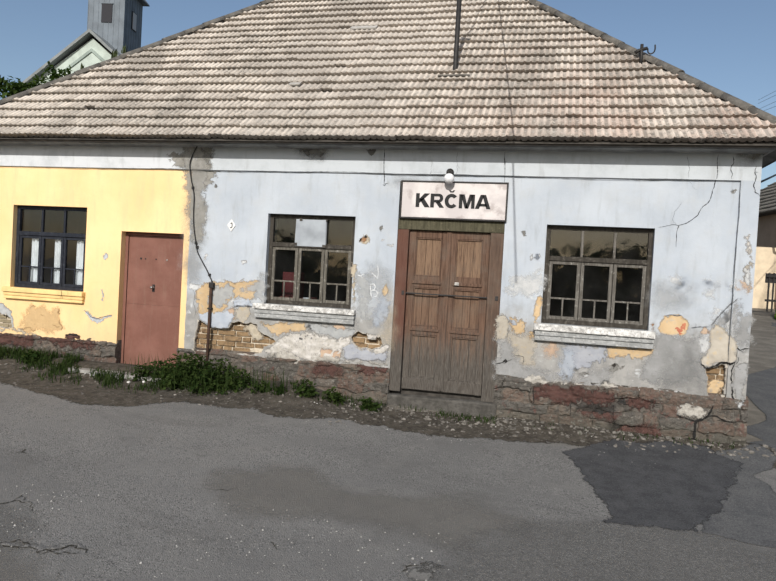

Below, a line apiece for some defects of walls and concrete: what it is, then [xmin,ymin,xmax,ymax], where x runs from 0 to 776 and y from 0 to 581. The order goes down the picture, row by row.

crack [114,165,190,173]
crack [423,153,610,182]
crack [663,157,760,399]
peeling [0,303,96,350]
peeling [84,310,112,324]
flaking render [189,262,389,376]
peeling [650,314,689,336]
peeling [492,269,661,436]
flaking render [699,304,754,401]
crack [677,406,740,440]